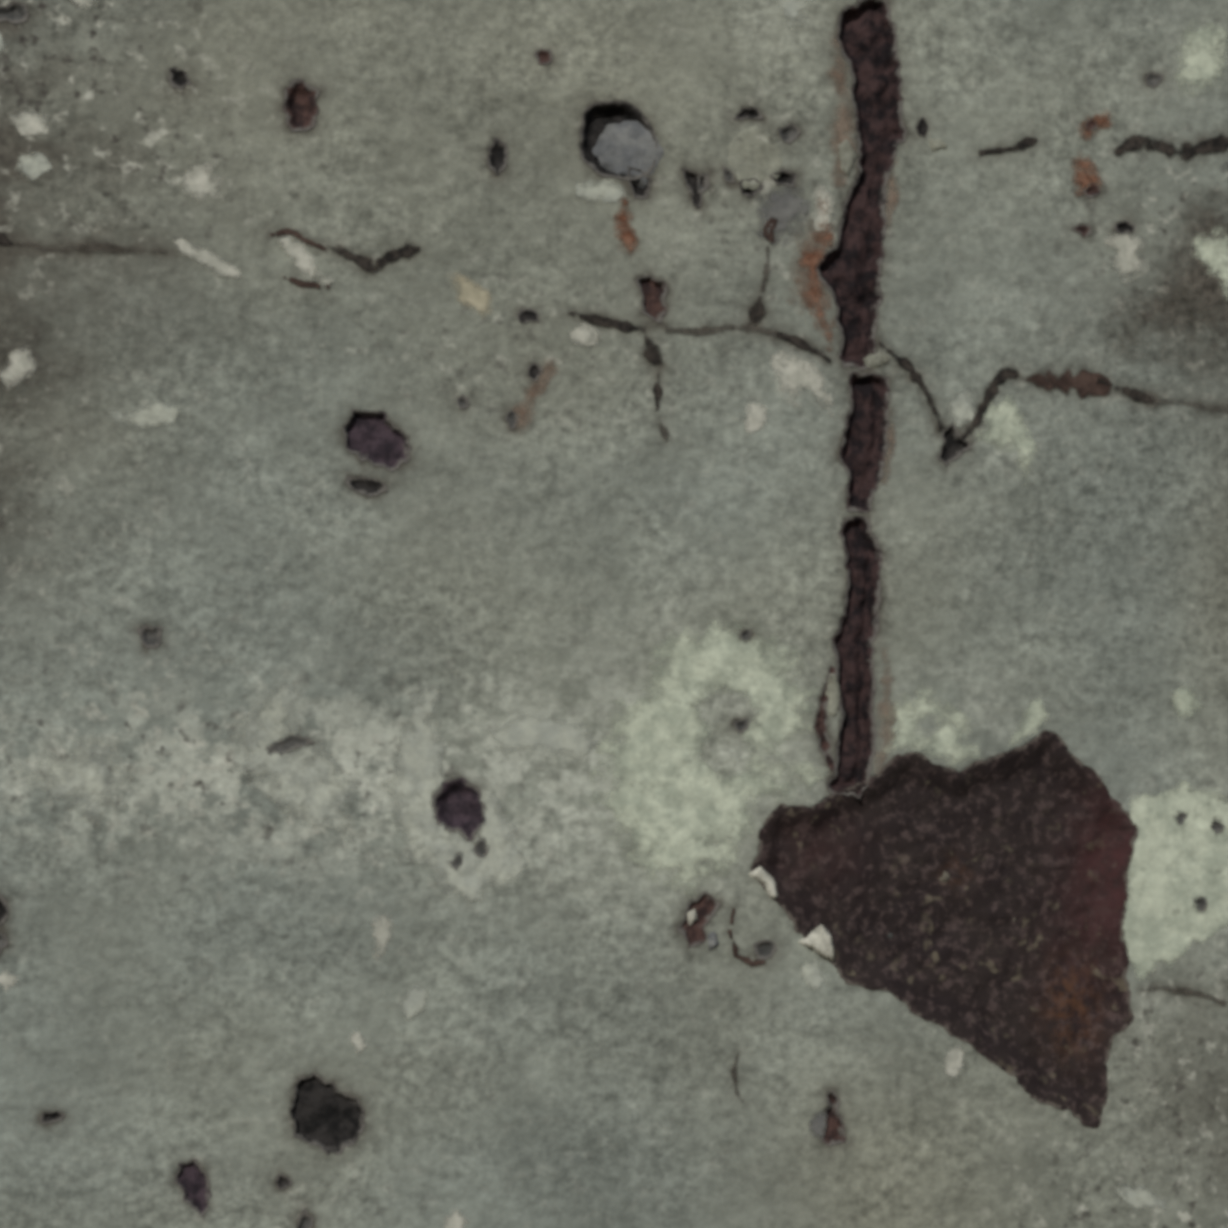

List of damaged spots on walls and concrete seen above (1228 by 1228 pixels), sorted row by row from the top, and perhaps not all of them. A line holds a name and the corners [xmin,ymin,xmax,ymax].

crack [1114,134,1228,160]
crack [0,232,164,253]
crack [283,276,330,288]
crack [270,228,420,272]
crack [568,0,1154,799]
spalling [342,409,412,497]
spalling [431,777,489,871]
spalling [749,730,1138,1128]
spalling [290,1072,366,1155]
spalling [820,1090,846,1146]